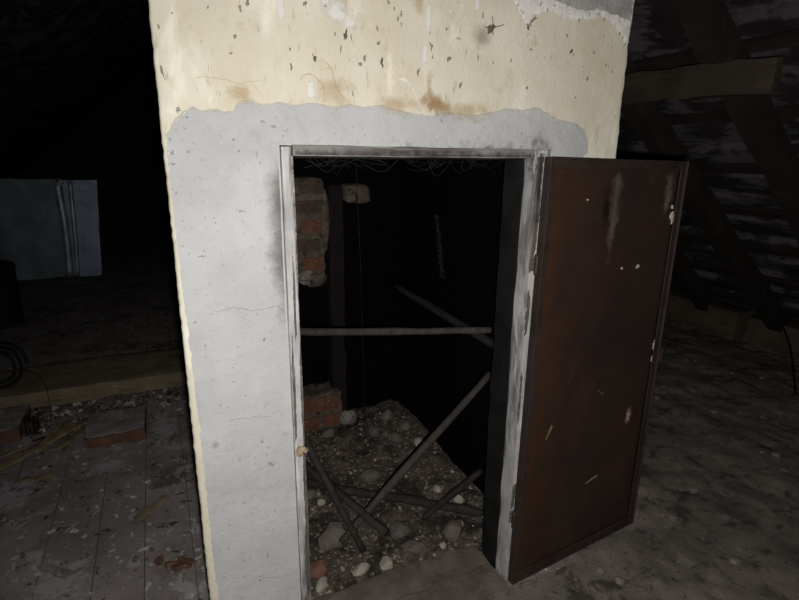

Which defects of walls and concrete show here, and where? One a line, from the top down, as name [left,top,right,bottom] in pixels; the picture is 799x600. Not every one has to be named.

spalling [514,0,633,45]